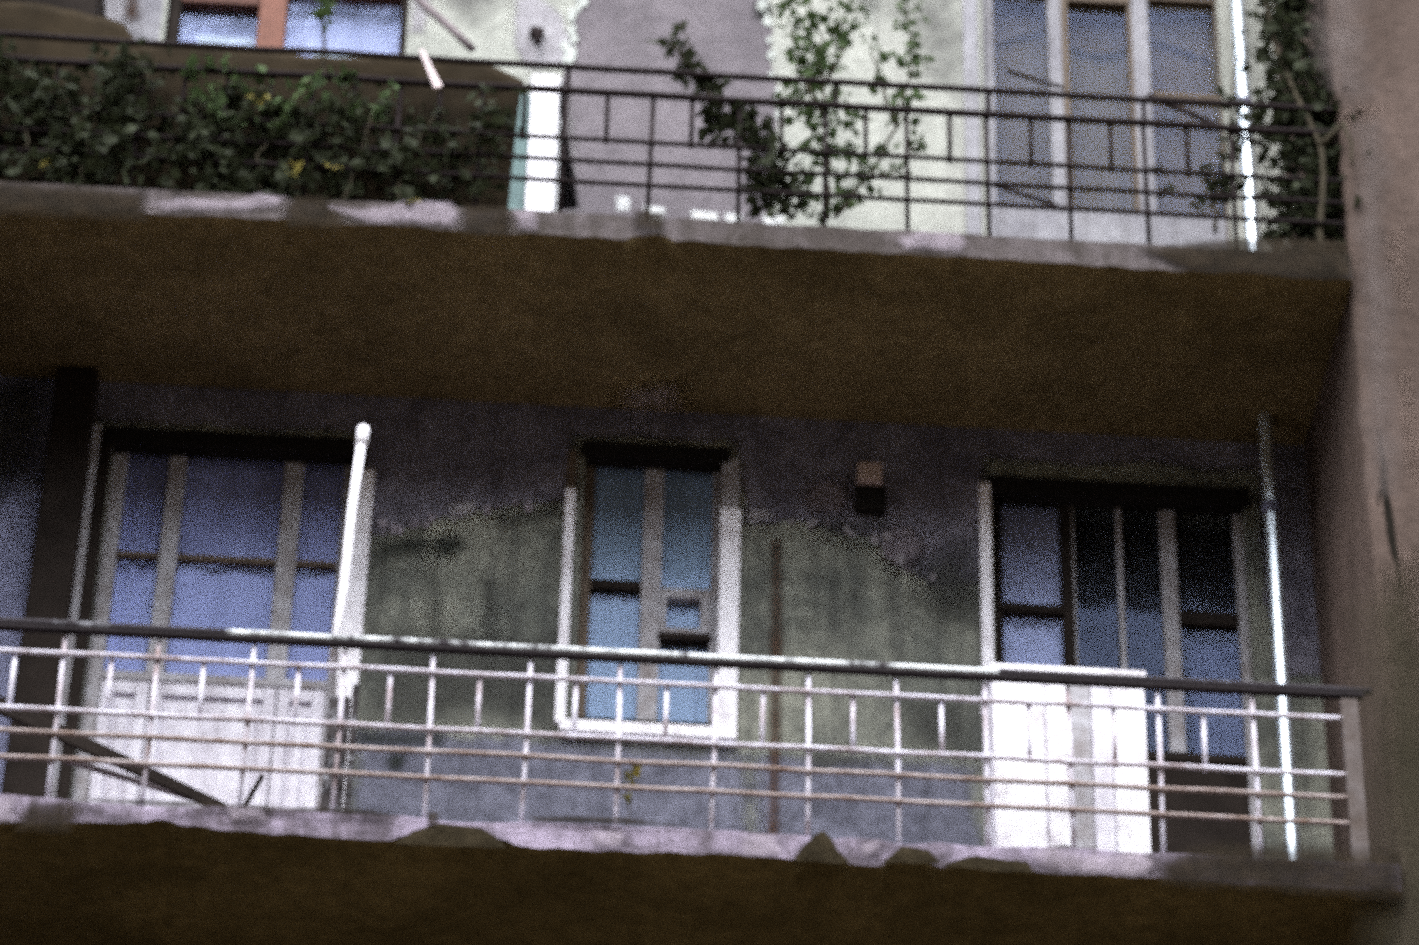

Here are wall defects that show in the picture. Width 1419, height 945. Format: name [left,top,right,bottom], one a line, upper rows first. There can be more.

peeling [515,0,784,228]
water stain [382,536,461,556]
water stain [929,557,970,612]
peeling [355,730,1150,873]